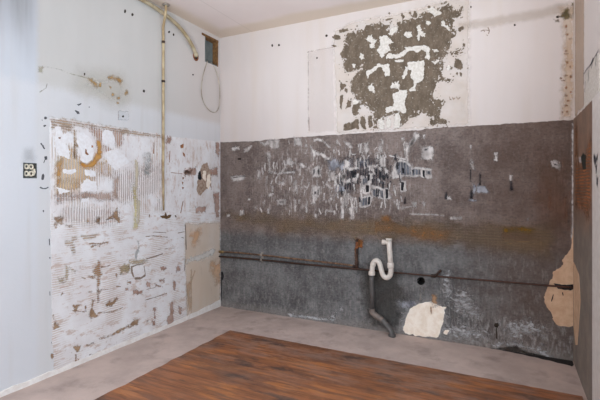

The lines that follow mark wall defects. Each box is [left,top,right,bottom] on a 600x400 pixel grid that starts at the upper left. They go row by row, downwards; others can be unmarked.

peeling [54,127,97,202]
peeling [102,129,129,170]
spalling [197,163,212,196]
flaking render [255,1,469,220]
spalling [544,123,598,345]
rust [560,0,584,116]